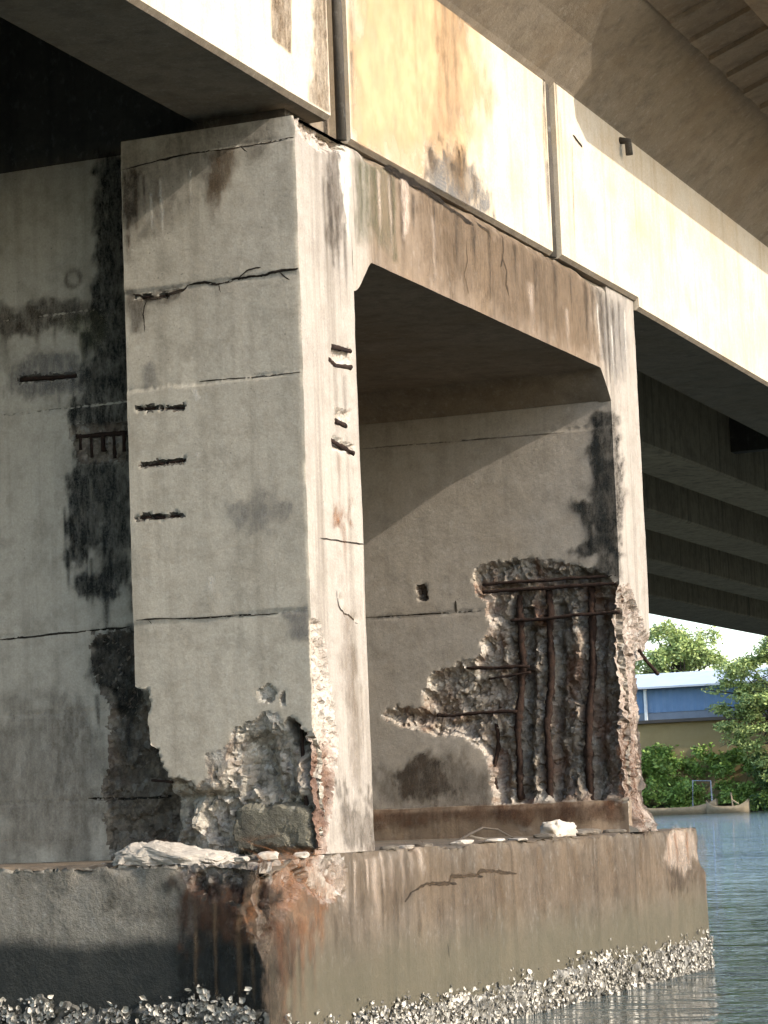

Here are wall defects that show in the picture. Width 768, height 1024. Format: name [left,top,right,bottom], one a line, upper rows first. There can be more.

crack [122,137,294,170]
water stain [329,0,490,226]
crack [133,267,298,331]
water stain [0,153,145,618]
water stain [572,411,624,577]
water stain [90,625,144,755]
spalling [381,557,660,832]
spalling [88,618,348,950]
rust [238,861,296,1024]
crack [405,869,517,902]